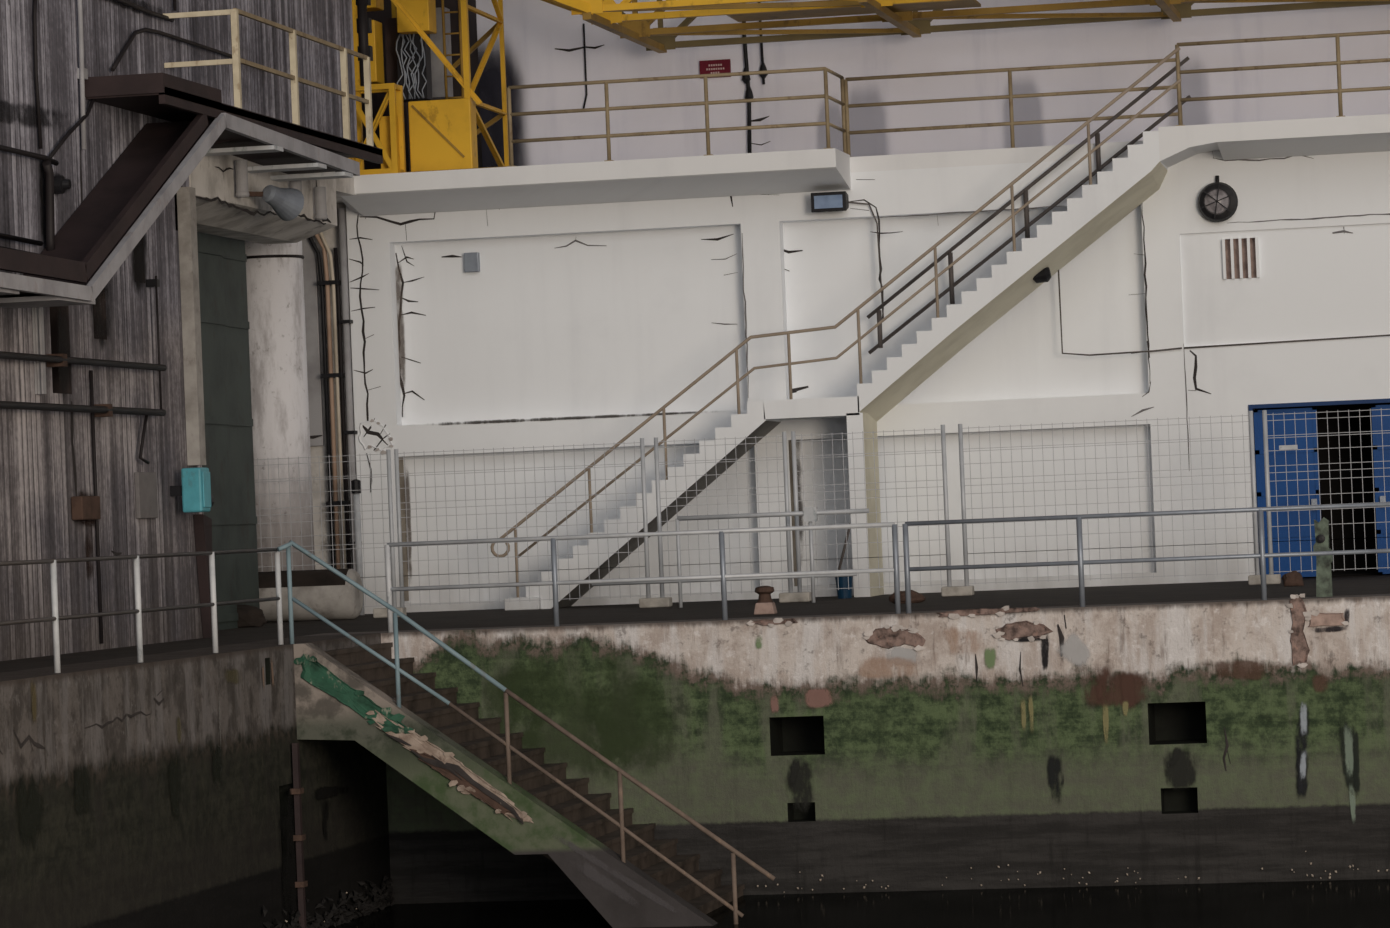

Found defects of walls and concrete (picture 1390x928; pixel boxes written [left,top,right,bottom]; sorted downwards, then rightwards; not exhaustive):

crack [196,167,461,492]
spalling [863,625,925,651]
spalling [937,606,1053,642]
water stain [1018,634,1090,669]
rust [1215,661,1264,679]
spalling [1286,594,1320,668]
rust [1021,698,1033,728]
rust [1086,668,1145,740]
peeling [294,654,533,823]
water stain [787,760,812,809]
water stain [1047,756,1064,798]